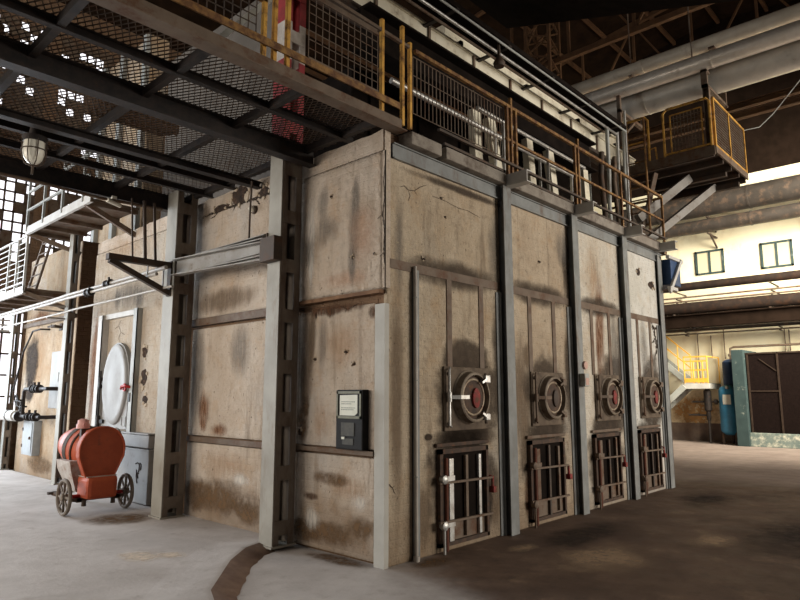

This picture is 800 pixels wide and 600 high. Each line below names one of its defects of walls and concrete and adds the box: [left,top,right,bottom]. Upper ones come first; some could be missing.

spalling [213,182,270,213]
crack [336,151,480,276]
spalling [138,344,148,407]
water stain [184,475,258,524]
water stain [317,474,345,485]
water stain [294,509,372,544]